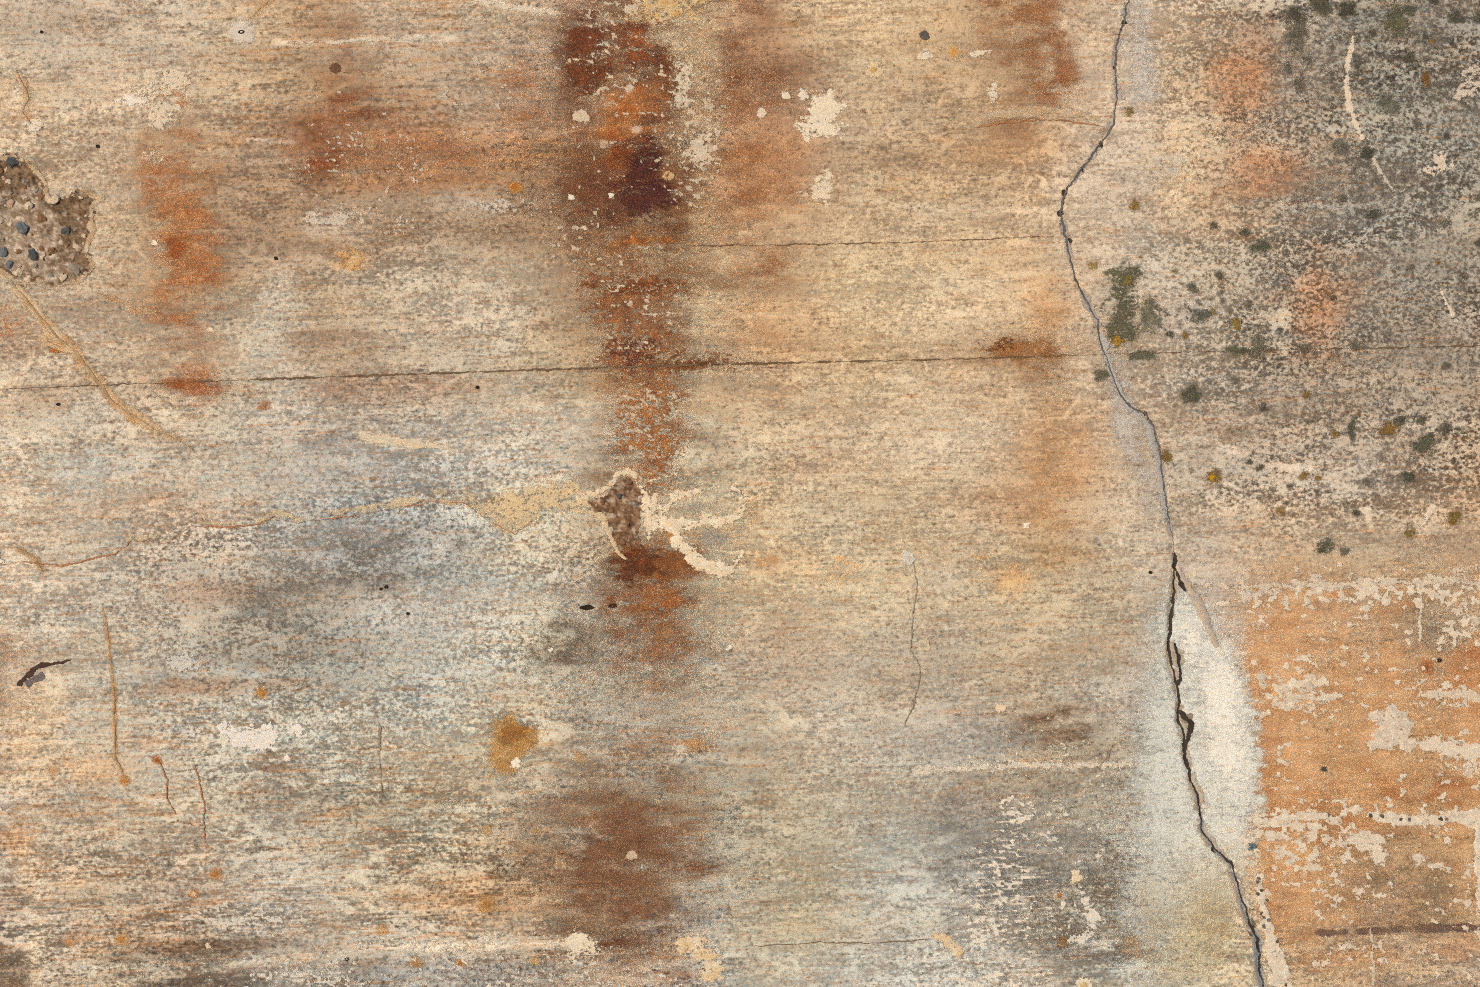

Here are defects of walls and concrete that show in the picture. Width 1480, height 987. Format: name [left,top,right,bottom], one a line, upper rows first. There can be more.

corrosion [979,1,1078,106]
damp [1126,0,1164,102]
spalling [0,153,106,289]
corrosion [139,156,223,331]
corrosion [553,0,741,489]
corrosion [164,366,222,421]
peeling [462,467,747,578]
crack [974,0,1267,987]
damp [1106,352,1157,522]
corrosion [603,544,705,673]
corrosion [491,717,537,772]
corrosion [554,799,708,951]